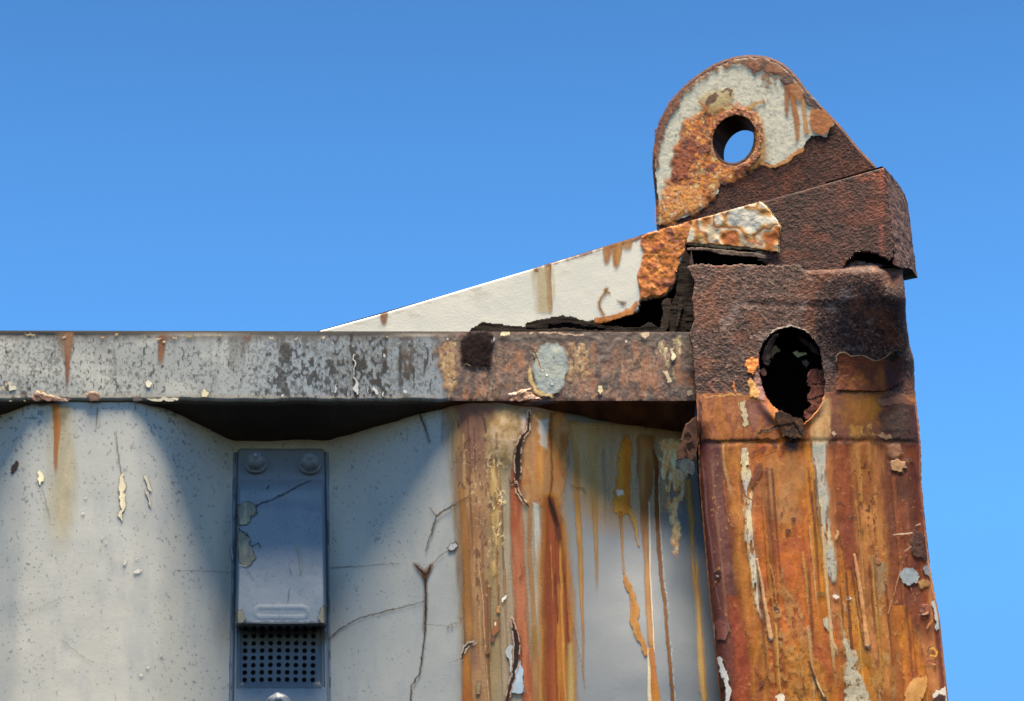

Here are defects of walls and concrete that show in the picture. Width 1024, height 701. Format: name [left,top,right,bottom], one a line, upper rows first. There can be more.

rust [62,332,73,382]
rust [158,335,167,360]
peeling [508,332,584,401]
rust [433,57,945,701]
rust [30,390,69,467]
peeling [118,472,126,521]
peeling [230,501,260,567]
crack [329,495,470,701]